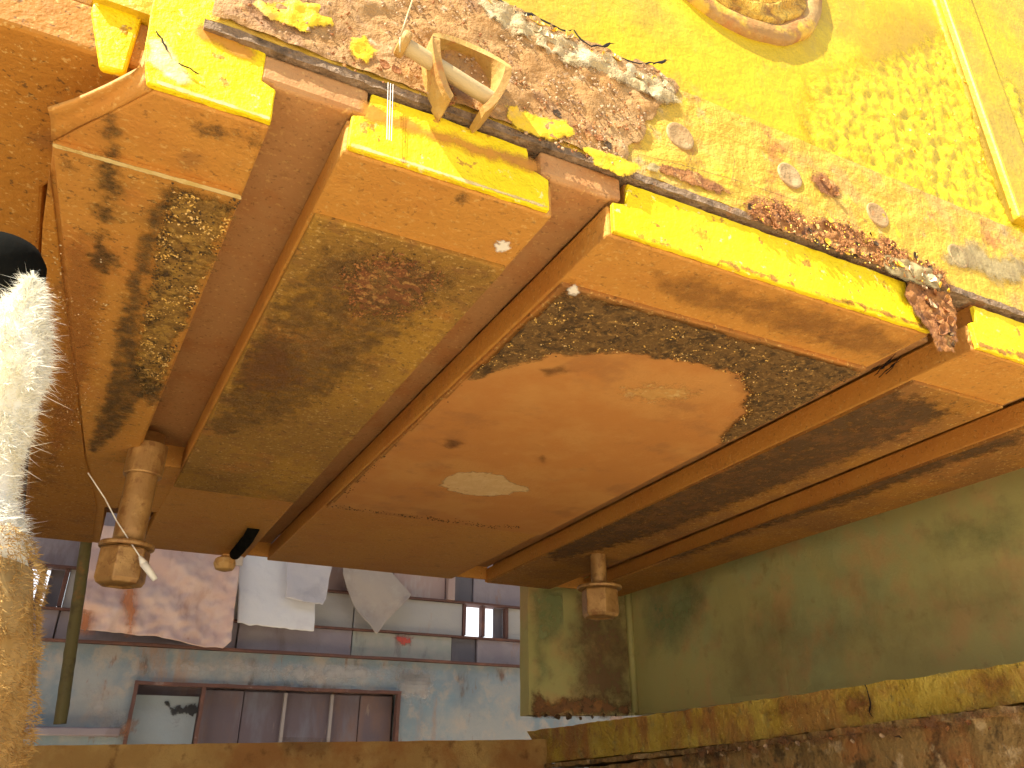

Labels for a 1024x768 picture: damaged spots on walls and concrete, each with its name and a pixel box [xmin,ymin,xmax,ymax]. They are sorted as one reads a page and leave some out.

damp [103,119,121,158]
peeling [212,0,681,177]
damp [89,192,174,452]
corrosion [832,298,929,329]
spalling [328,349,754,535]
damp [666,433,1024,559]
corrosion [532,693,630,720]